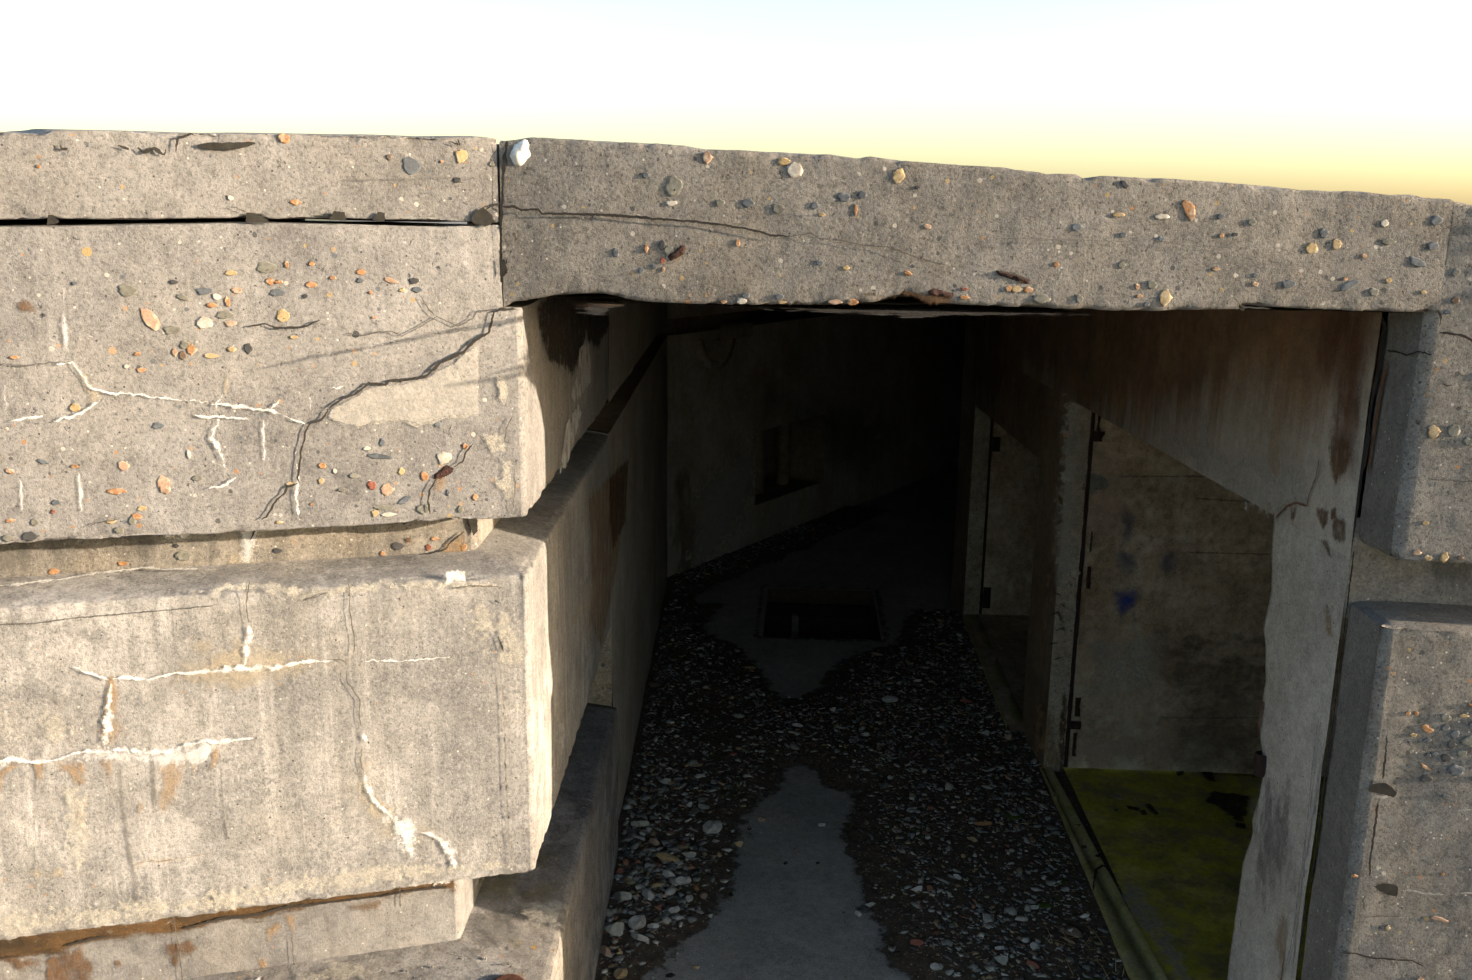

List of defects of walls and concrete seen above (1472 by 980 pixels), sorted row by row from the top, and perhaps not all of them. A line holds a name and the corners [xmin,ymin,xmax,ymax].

crack [502,205,945,265]
crack [0,360,70,368]
peeling [329,348,479,426]
crack [1387,332,1472,356]
crack [248,296,516,555]
spalling [433,465,454,479]
peeling [487,416,516,507]
crack [243,582,251,622]
damp [0,626,333,764]
rust [9,947,92,980]
rust [166,917,195,980]